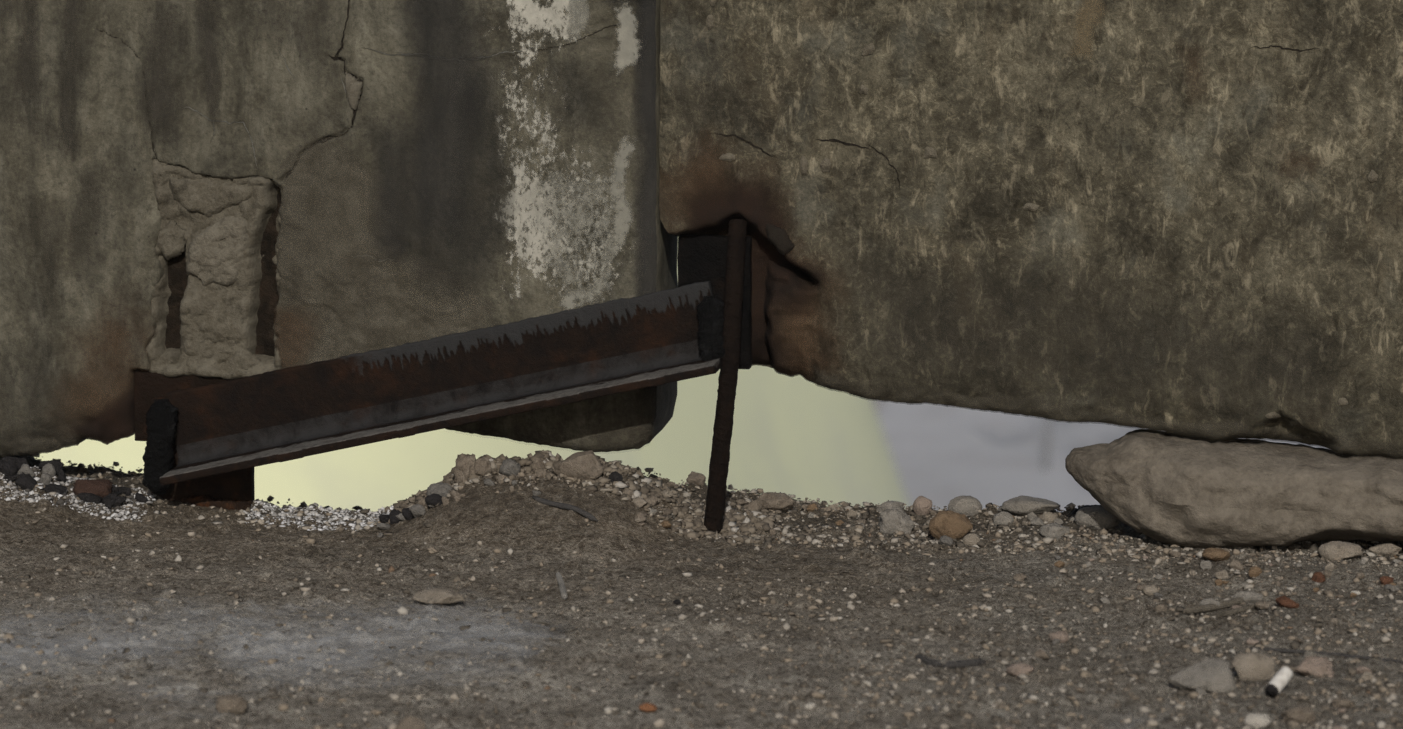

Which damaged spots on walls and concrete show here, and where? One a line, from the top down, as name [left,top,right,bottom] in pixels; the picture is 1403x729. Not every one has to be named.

crack [96,28,157,157]
spalling [145,158,285,380]
crack [283,0,421,179]
water stain [537,0,657,310]
corrosion [664,146,828,379]